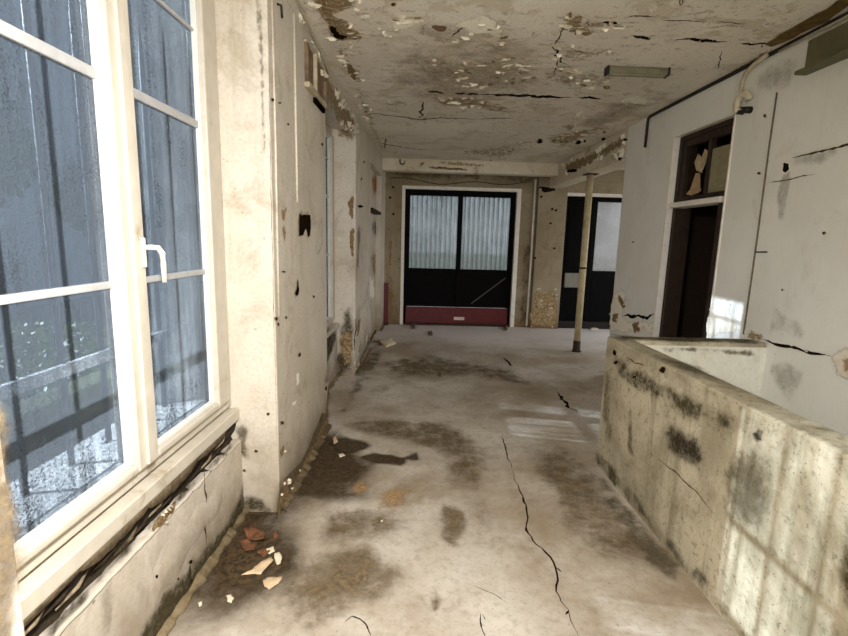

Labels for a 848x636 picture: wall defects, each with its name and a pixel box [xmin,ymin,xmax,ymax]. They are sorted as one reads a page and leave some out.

flaking render [308,0,384,147]
peeling [378,15,508,48]
crack [372,29,601,120]
peeling [424,12,627,113]
crack [769,143,848,183]
water stain [327,312,383,392]
water stain [612,334,756,356]
crack [757,334,830,357]
water stain [667,427,701,465]
peeling [152,501,179,531]
water stain [142,399,418,636]
crack [502,438,579,636]